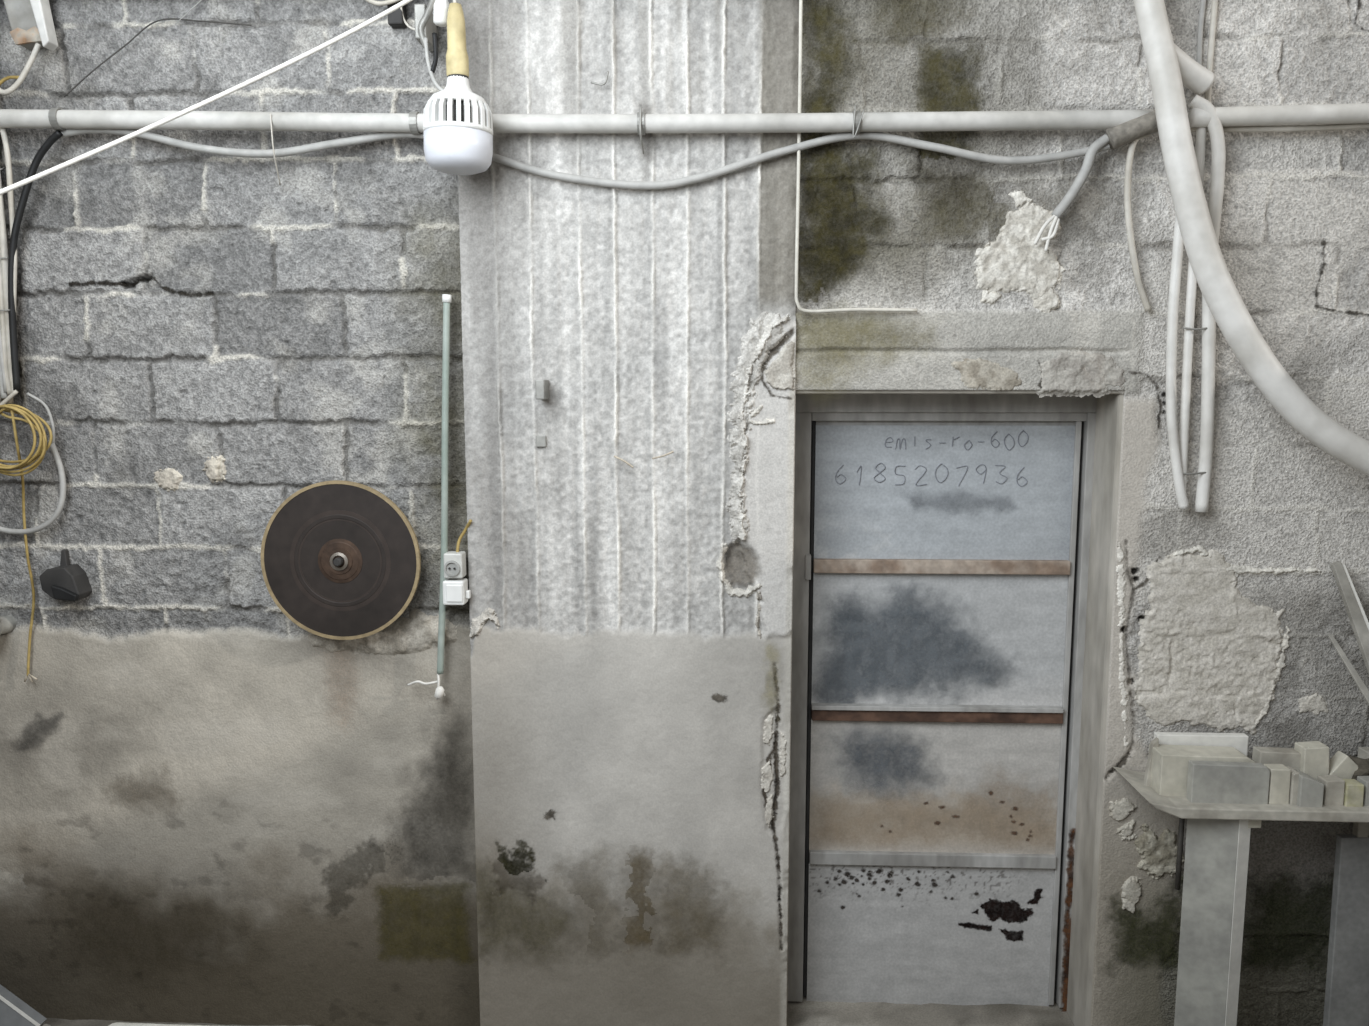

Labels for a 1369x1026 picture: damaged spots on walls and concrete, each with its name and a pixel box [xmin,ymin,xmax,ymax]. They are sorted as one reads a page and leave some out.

peeling [974,190,1065,313]
spalling [716,311,796,639]
crack [1106,541,1160,778]
leakage [497,841,546,882]
crack [761,665,787,950]